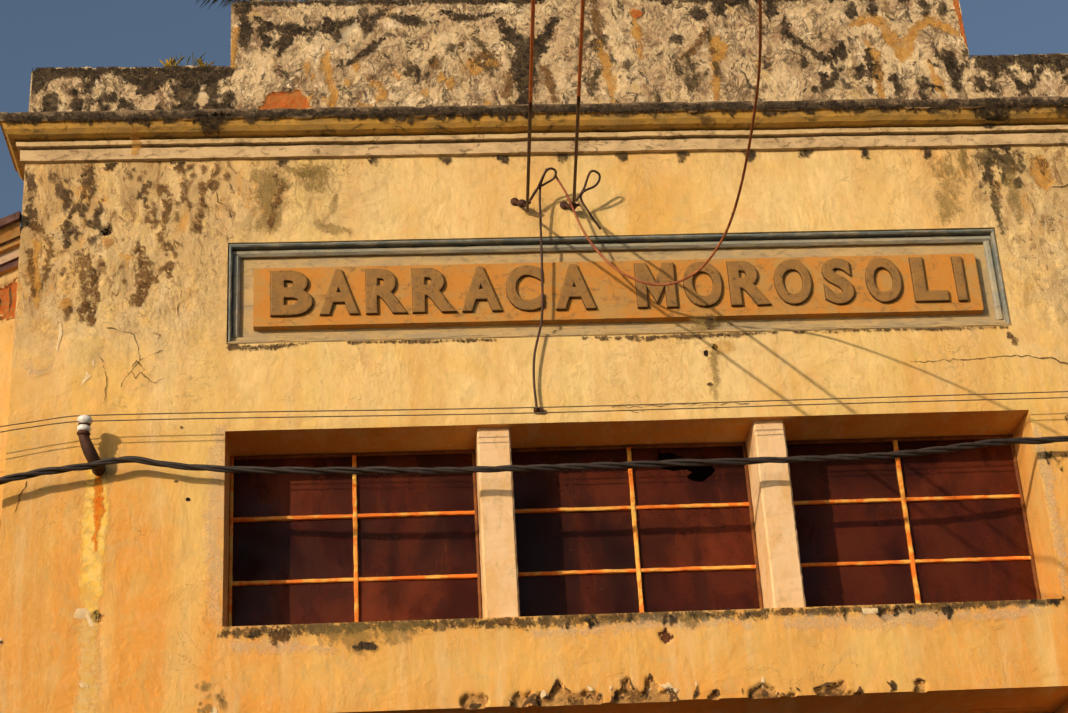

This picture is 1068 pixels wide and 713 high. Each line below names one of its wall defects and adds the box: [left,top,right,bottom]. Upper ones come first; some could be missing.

damp [3,0,1068,139]
spalling [258,90,310,110]
damp [923,146,1026,234]
damp [25,162,230,309]
spalling [0,277,18,320]
crack [100,327,164,397]
crack [900,355,1068,364]
rust [73,462,109,713]
damp [217,597,1064,651]
spalling [508,673,679,708]
spalling [742,677,800,699]
spalling [813,680,864,696]